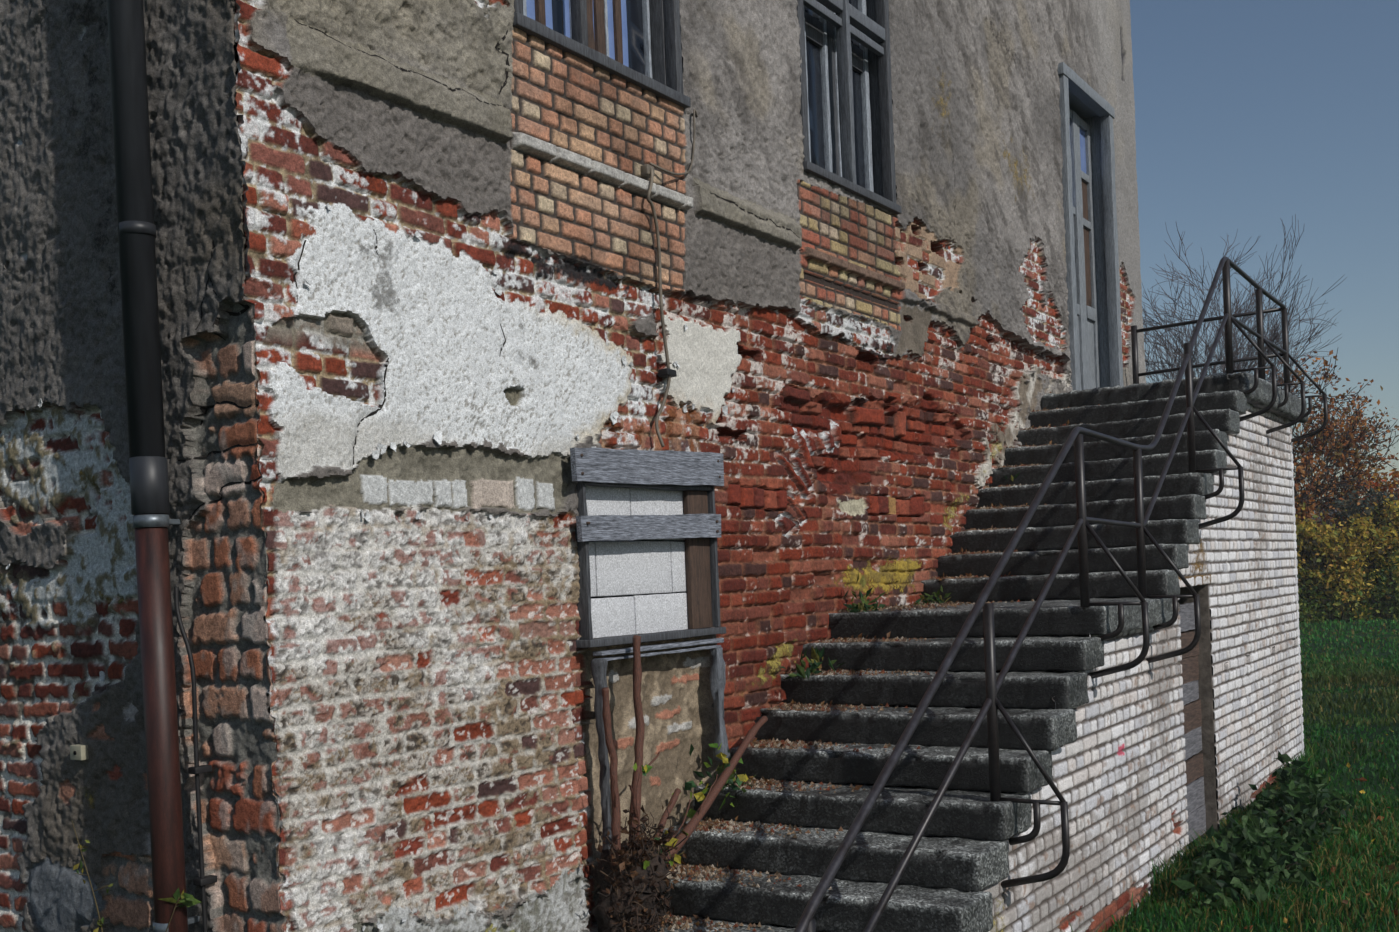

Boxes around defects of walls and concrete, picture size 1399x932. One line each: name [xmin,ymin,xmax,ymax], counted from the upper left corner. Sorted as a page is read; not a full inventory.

flaking render [0,398,139,932]
flaking render [99,850,154,932]
peeling [176,0,1072,932]